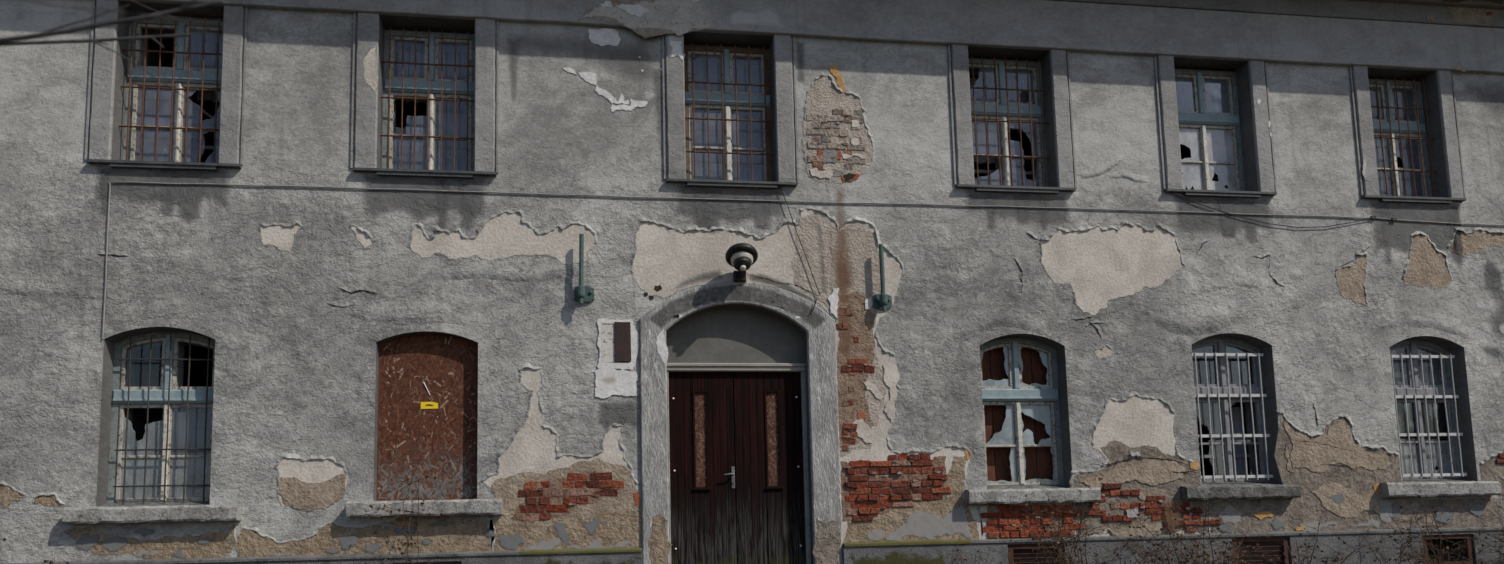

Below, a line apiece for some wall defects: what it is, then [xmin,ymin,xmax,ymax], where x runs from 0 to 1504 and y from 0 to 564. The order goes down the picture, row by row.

flaking render [578,0,712,72]
peeling [563,67,648,112]
flaking render [801,64,876,185]
flaking render [406,209,599,265]
flaking render [629,207,1504,564]
flaking render [0,481,65,509]
flaking render [62,363,672,564]